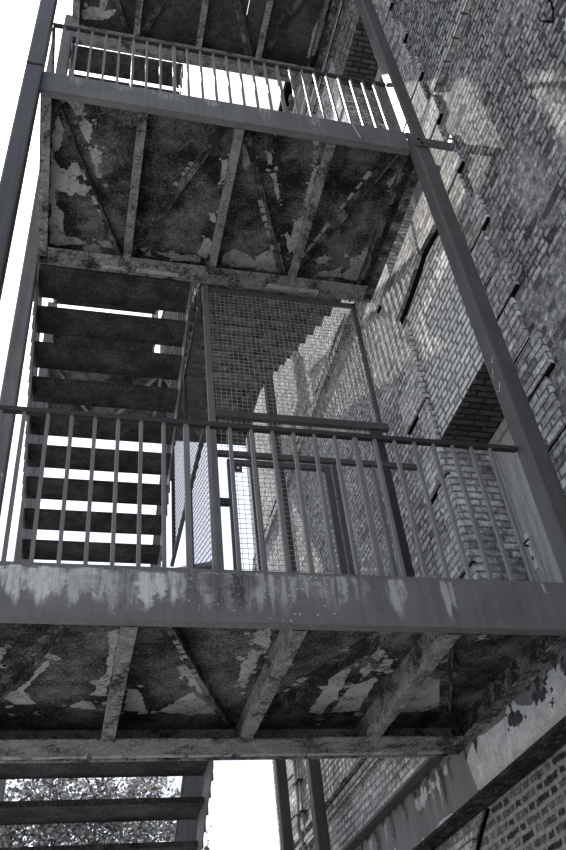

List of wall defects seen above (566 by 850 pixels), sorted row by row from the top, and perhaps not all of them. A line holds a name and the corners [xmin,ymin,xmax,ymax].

peeling [80,0,116,26]
peeling [48,99,126,271]
peeling [135,137,372,282]
peeling [266,283,319,294]
peeling [4,654,61,716]
peeling [62,630,119,710]
peeling [120,640,215,718]
peeling [232,629,271,694]
peeling [309,645,398,725]
peeling [401,677,440,713]
peeling [463,656,566,790]